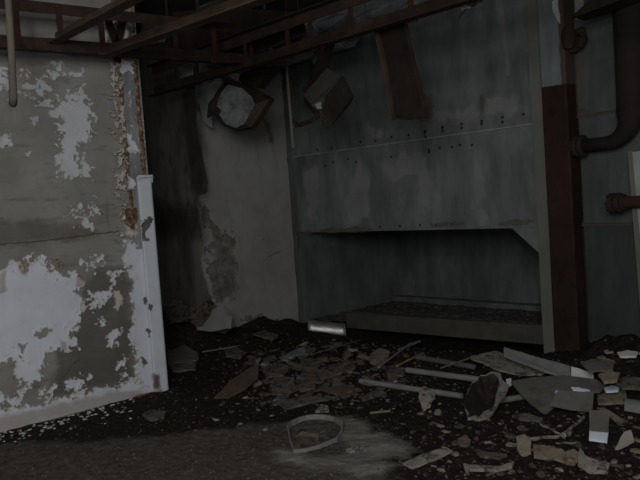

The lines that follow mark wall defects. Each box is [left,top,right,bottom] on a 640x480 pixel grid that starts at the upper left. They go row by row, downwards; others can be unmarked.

rust [117,62,134,207]
rust [132,59,146,175]
crack [0,204,119,245]
peeling [0,58,154,432]
peeling [199,205,239,304]